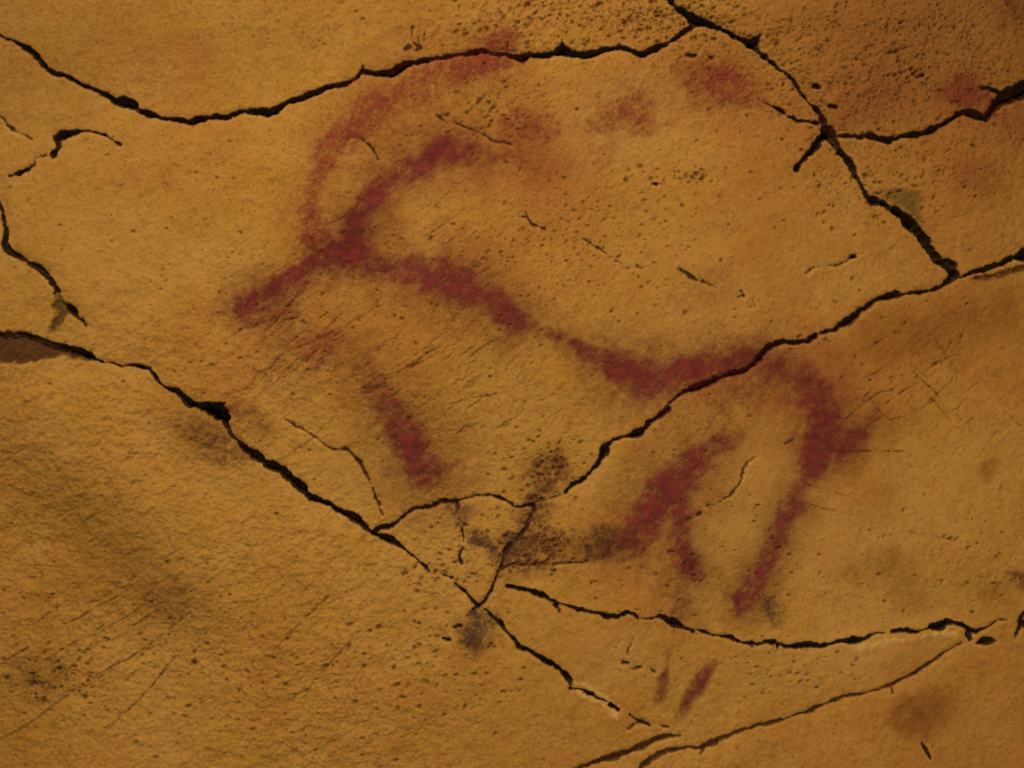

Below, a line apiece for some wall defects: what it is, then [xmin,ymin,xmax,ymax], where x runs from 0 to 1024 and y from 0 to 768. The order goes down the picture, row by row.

crack [0,0,1024,499]
crack [0,331,546,616]
crack [689,458,753,519]
crack [485,584,1004,768]
crack [1015,611,1024,638]